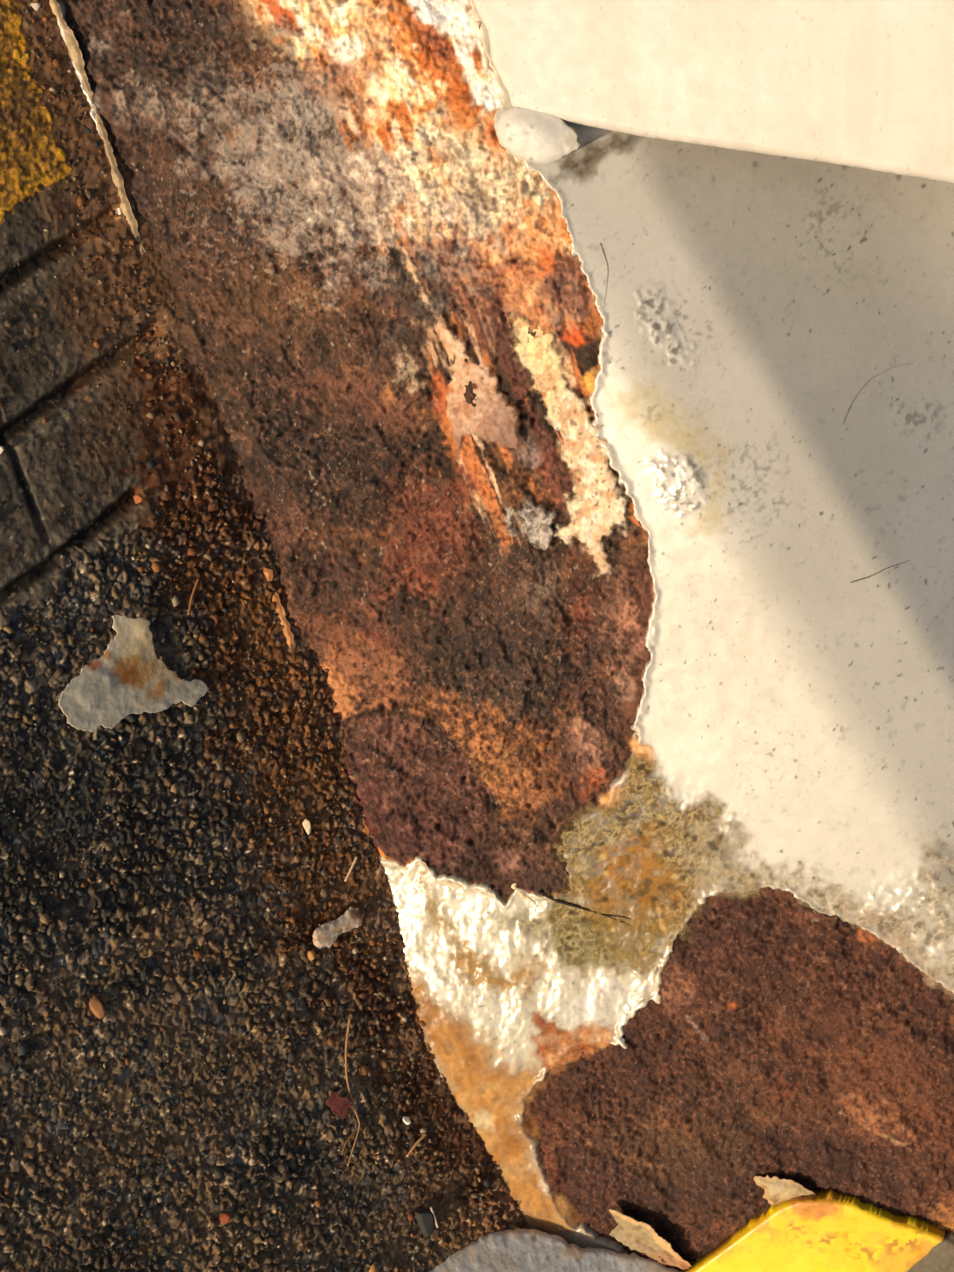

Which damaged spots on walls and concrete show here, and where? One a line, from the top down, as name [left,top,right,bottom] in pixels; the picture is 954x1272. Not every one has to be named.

rust [49,0,654,965]
damp [752,844,954,985]
rust [287,887,954,1271]
peeling [609,1208,692,1270]
peeling [754,1175,816,1206]